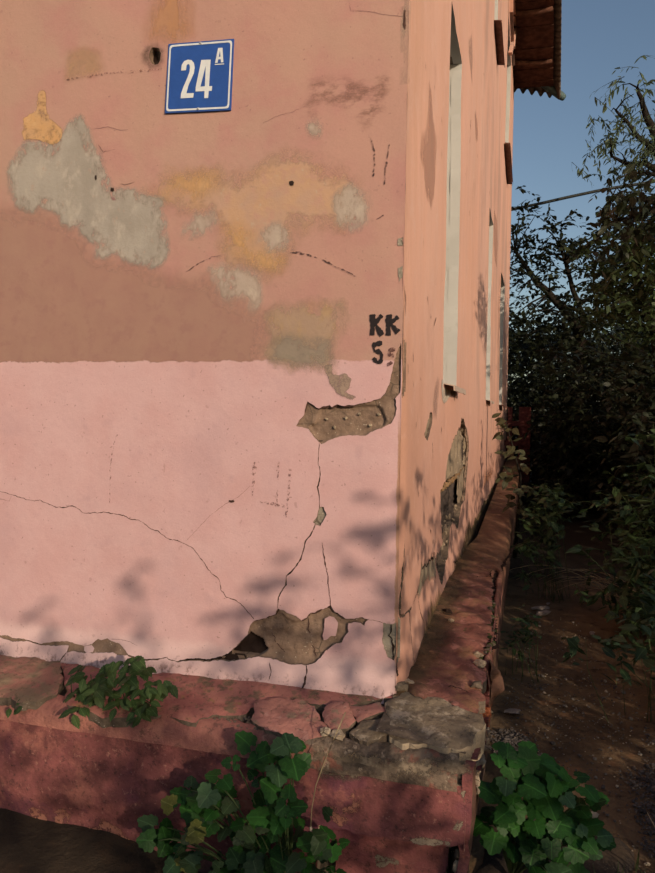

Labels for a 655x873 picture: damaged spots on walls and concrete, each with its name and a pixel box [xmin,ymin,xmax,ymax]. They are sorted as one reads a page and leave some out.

peeling [7,90,367,308]
damp [423,96,436,202]
flaking render [297,340,406,447]
crack [0,486,254,619]
crack [279,527,331,610]
flaking render [418,427,468,596]
crack [133,651,247,661]
flaking render [221,606,368,664]